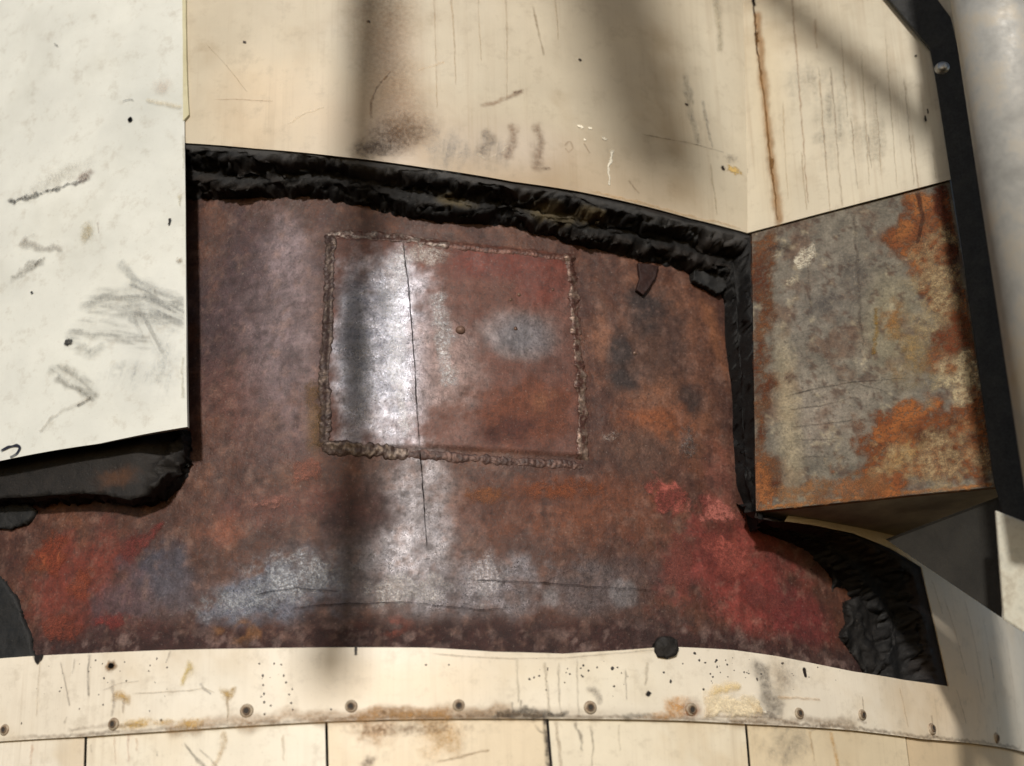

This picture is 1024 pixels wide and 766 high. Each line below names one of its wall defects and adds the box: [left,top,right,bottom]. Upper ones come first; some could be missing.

crack [403,246,427,545]
corrosion [752,185,992,510]